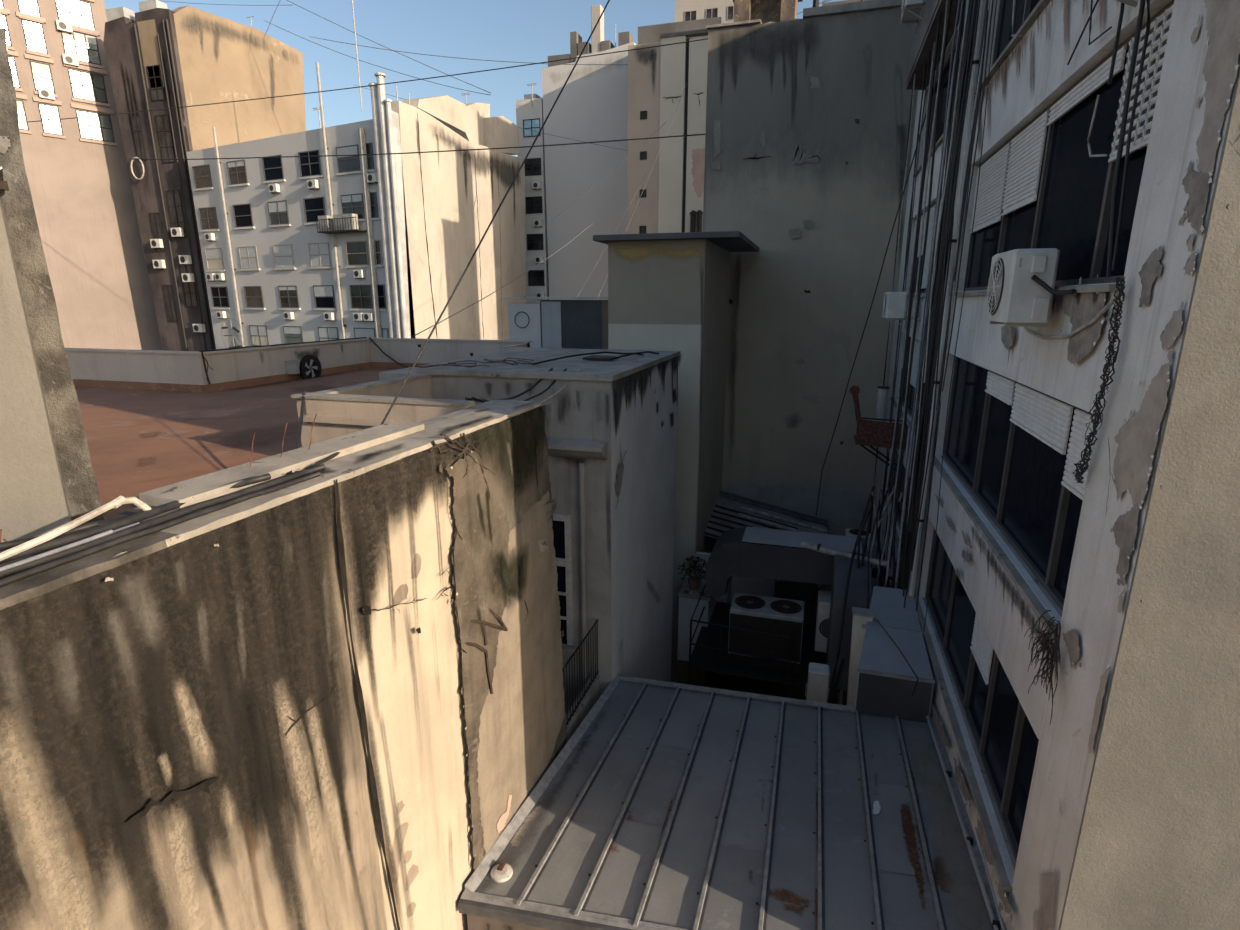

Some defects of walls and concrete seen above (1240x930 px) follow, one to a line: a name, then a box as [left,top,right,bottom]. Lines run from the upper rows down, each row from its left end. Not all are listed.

flaking render [0,136,11,154]
water stain [436,133,519,209]
peeling [690,120,721,198]
water stain [705,5,925,200]
peeling [1179,0,1240,276]
peeling [1138,245,1163,307]
water stain [606,355,681,434]
peeling [1110,301,1184,613]
water stain [0,393,579,930]
peeling [1088,663,1111,758]
corrosion [900,742,953,908]
corrosion [769,889,818,928]